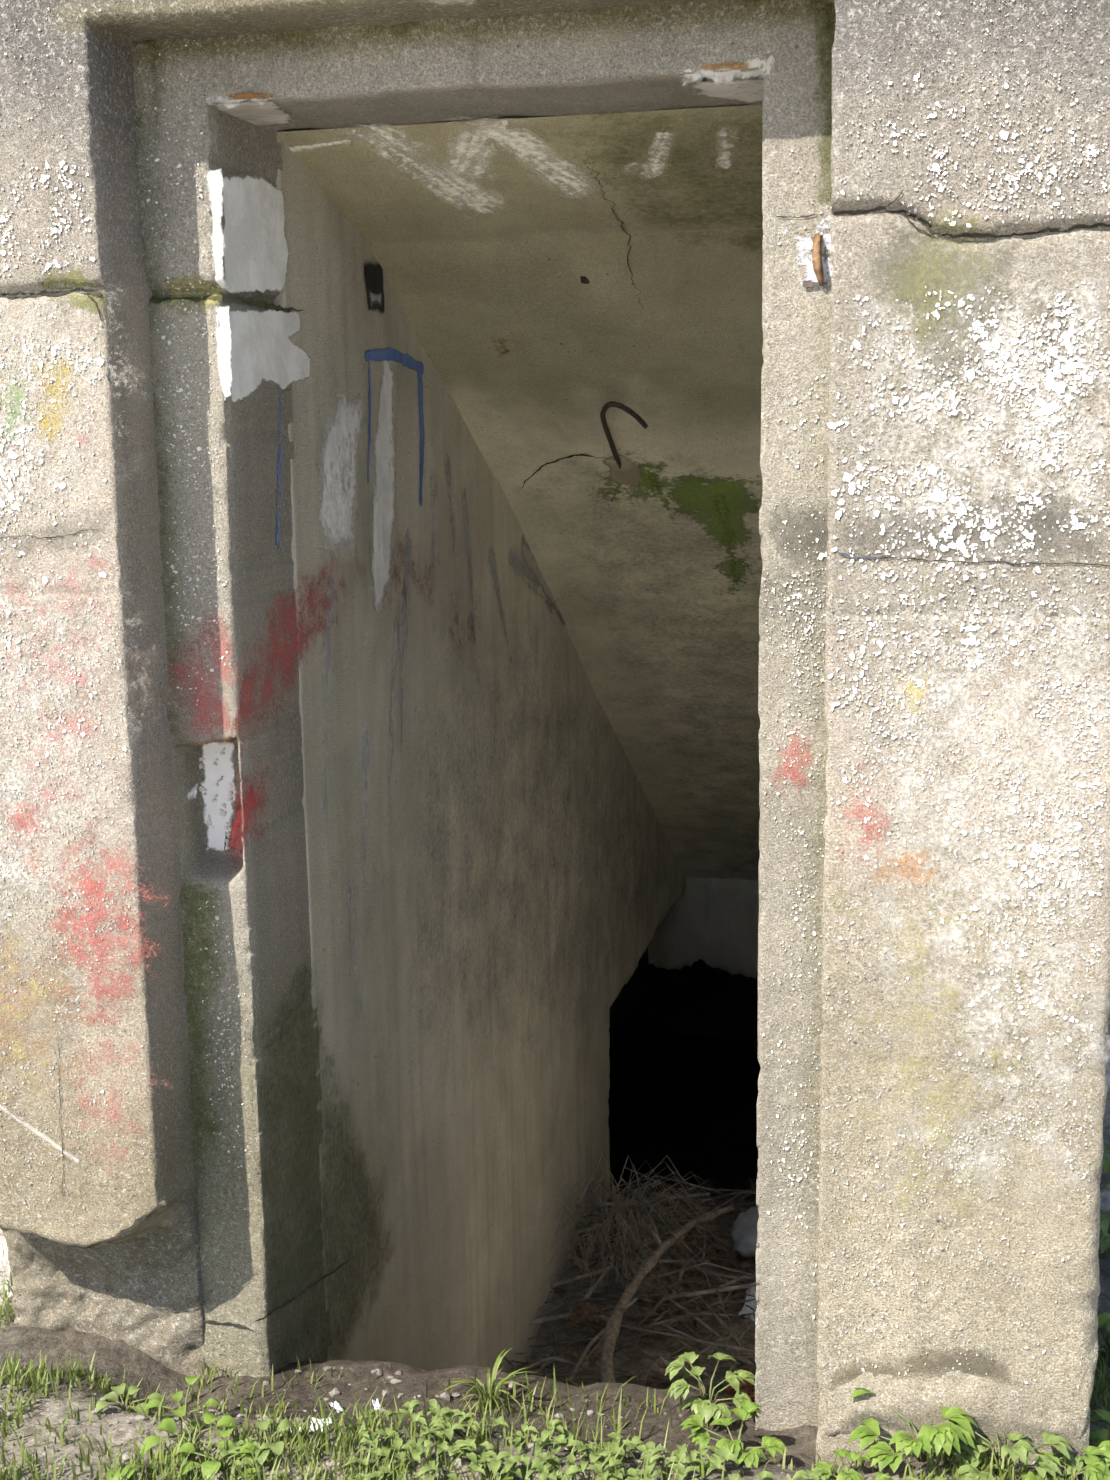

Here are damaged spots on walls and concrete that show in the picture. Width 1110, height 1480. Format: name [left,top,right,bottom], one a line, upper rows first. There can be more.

crack [580,148,642,314]
crack [776,191,1110,239]
crack [0,287,102,321]
crack [150,295,304,313]